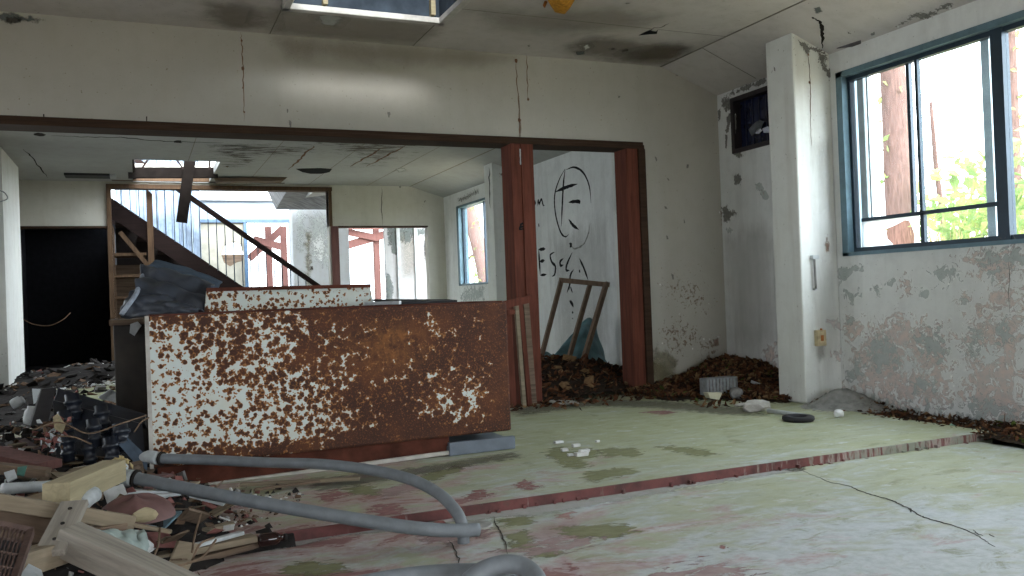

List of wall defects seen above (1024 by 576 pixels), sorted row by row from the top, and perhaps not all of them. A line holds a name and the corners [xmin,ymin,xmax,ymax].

crack [239,36,247,117]
crack [515,59,529,133]
peeling [717,78,766,158]
crack [807,17,825,145]
peeling [719,206,737,234]
peeling [827,244,1024,426]
crack [807,472,994,546]